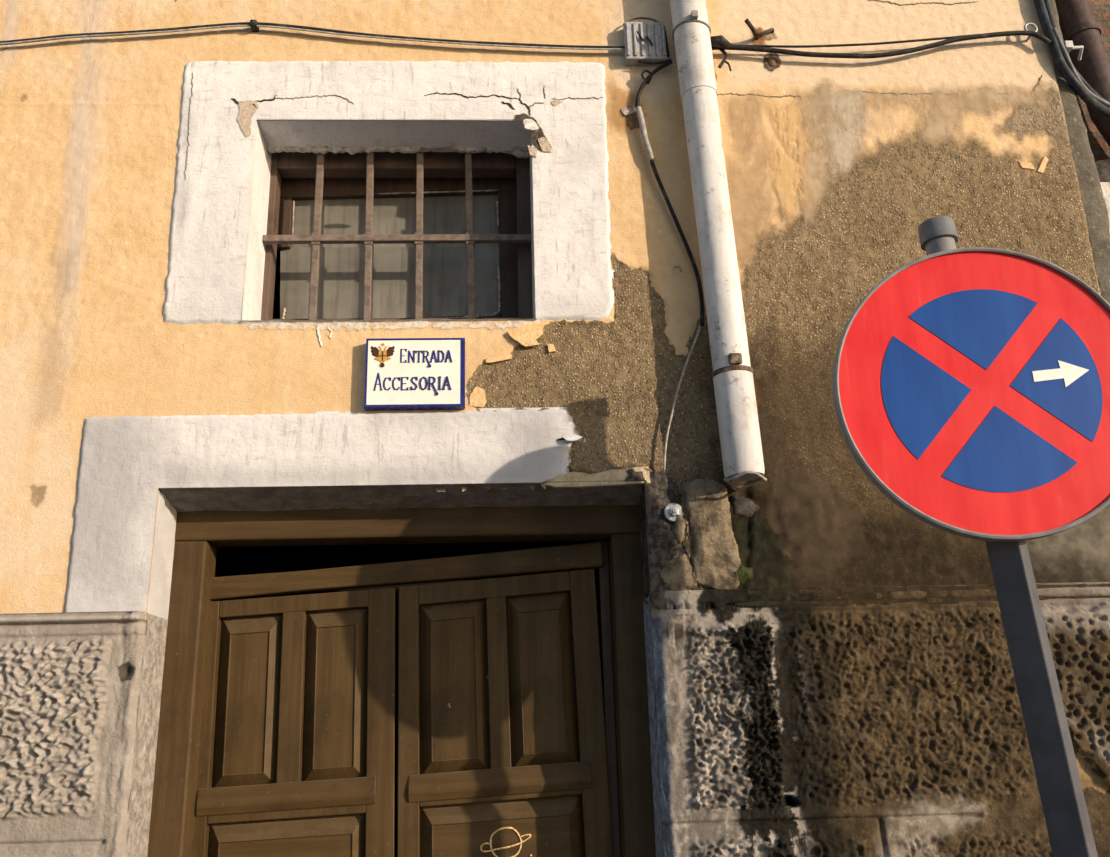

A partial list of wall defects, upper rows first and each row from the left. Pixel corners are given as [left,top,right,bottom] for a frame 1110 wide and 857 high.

crack [869,0,978,8]
flaking render [231,95,277,137]
crack [275,94,354,104]
crack [425,86,603,115]
flaking render [466,86,1101,659]
leakage [1032,559,1110,600]
spalling [119,661,136,682]
leakage [698,490,998,857]